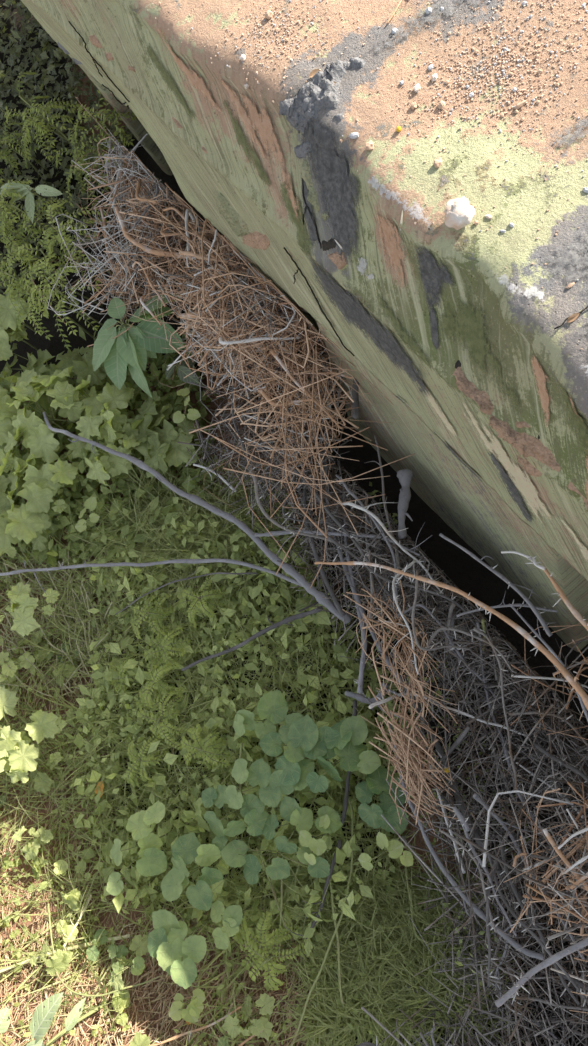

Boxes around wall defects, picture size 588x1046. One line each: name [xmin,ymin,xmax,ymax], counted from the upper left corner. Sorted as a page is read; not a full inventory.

crack [301,174,322,249]
leakage [301,117,431,262]
crack [284,247,355,356]
leakage [497,274,545,301]
leakage [544,229,588,291]
corrosion [531,357,551,424]